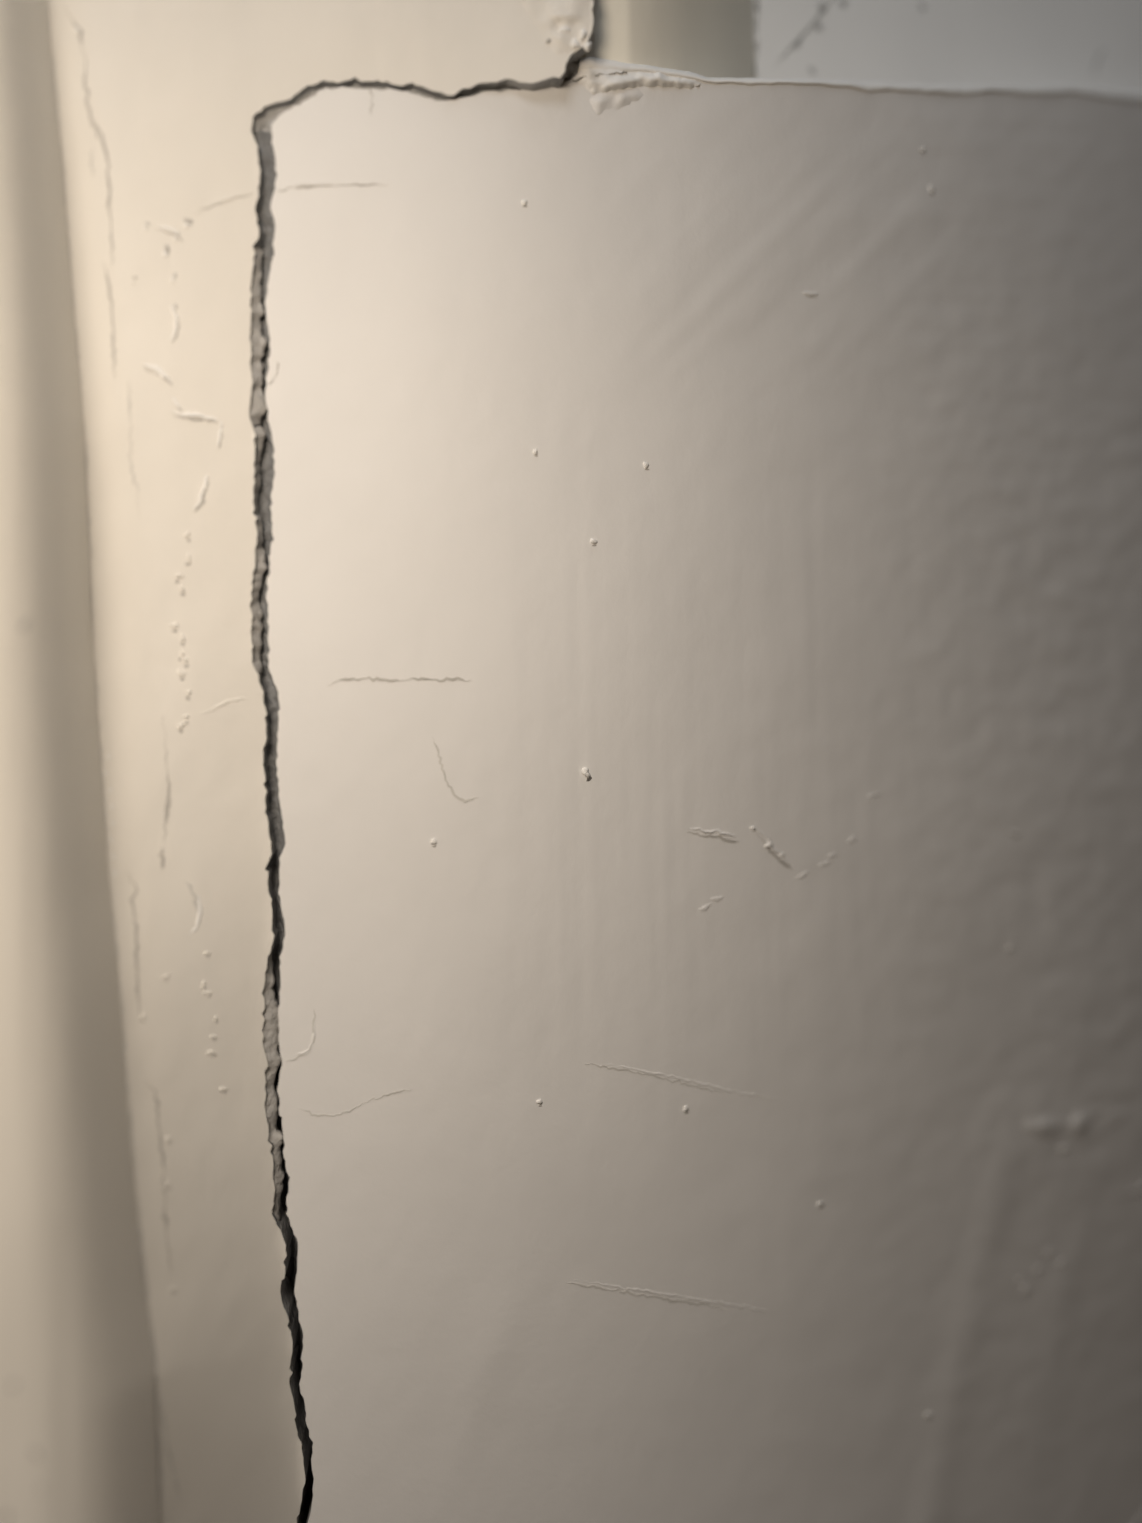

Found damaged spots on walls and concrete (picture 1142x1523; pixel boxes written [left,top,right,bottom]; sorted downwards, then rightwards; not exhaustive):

crack [563,59,581,81]
flaking render [522,0,702,115]
crack [198,83,513,1523]